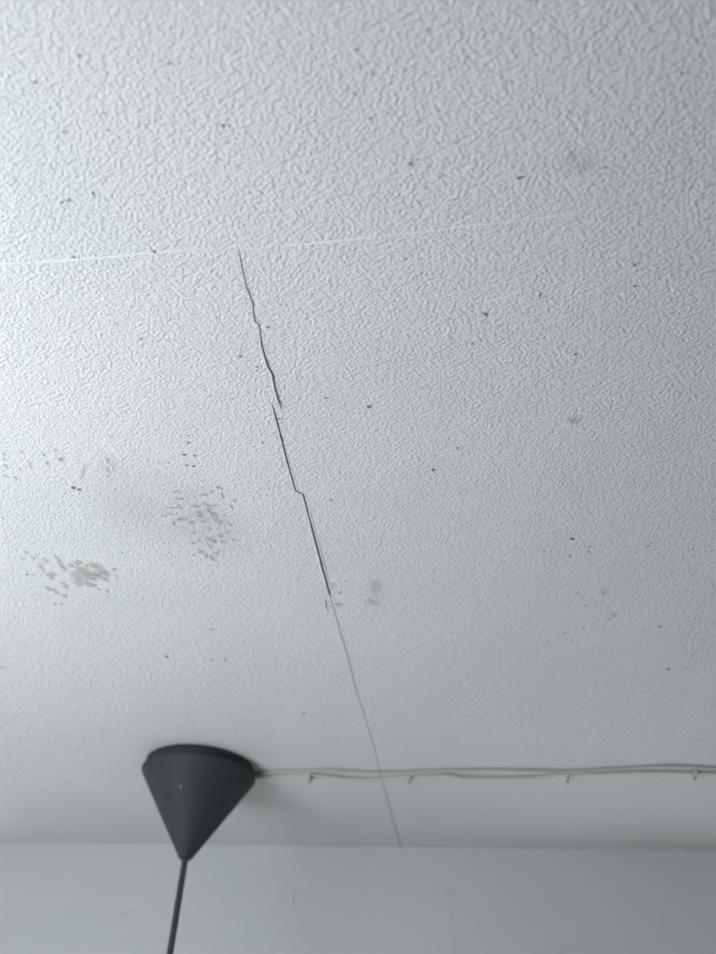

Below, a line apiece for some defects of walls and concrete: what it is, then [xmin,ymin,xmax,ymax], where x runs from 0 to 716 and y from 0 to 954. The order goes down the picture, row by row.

crack [238,250,402,847]